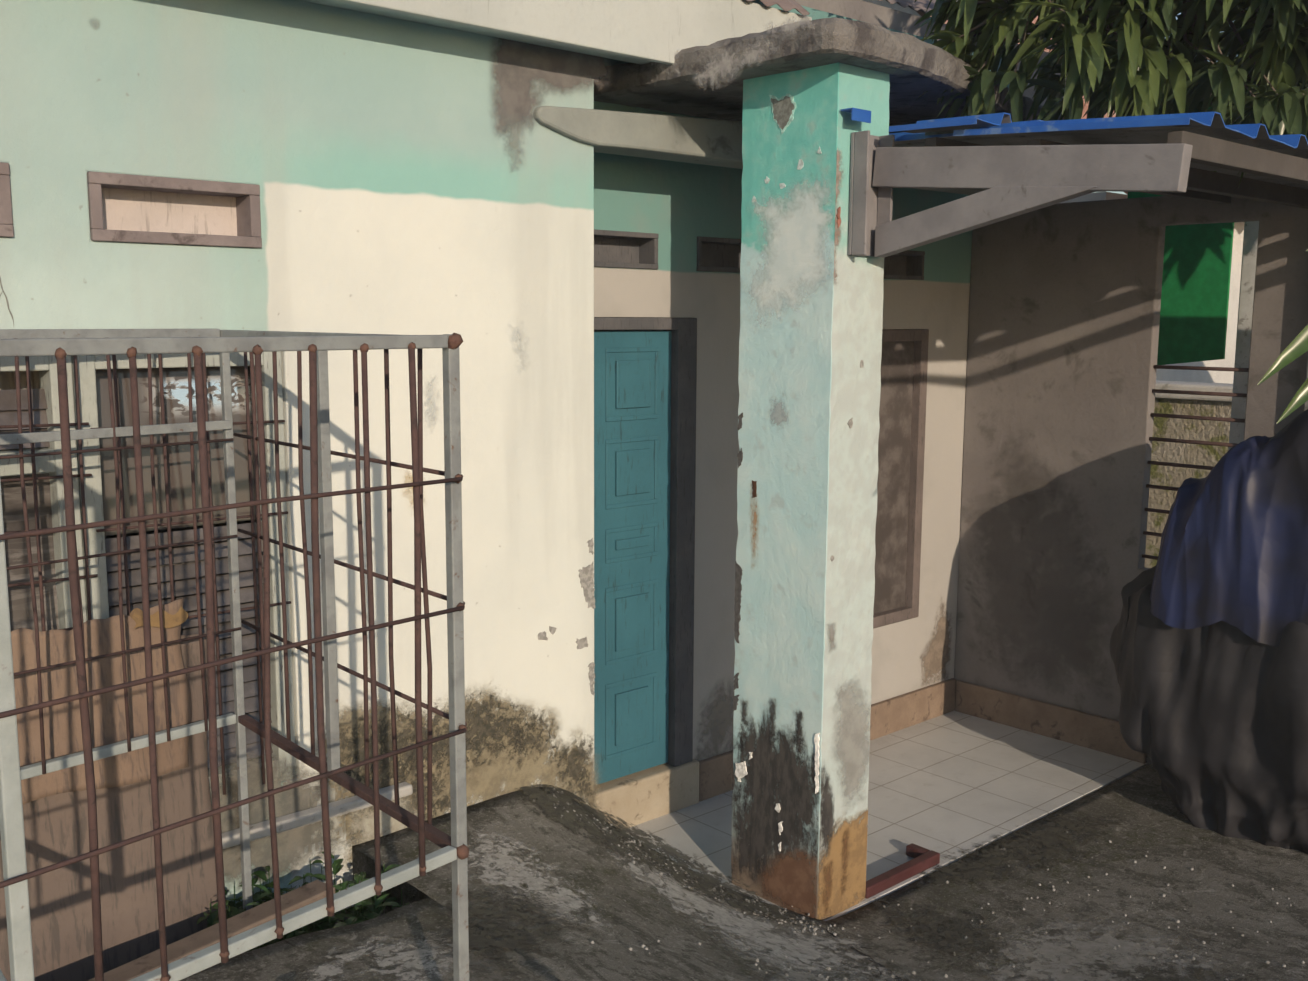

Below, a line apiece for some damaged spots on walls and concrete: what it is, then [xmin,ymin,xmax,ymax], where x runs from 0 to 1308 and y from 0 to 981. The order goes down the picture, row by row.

spalling [769,93,796,134]
peeling [751,146,842,323]
crack [0,278,14,325]
peeling [578,538,595,609]
peeling [538,626,557,640]
peeling [576,637,588,649]
damp [209,704,451,884]
damp [465,693,599,812]
damp [697,687,870,880]